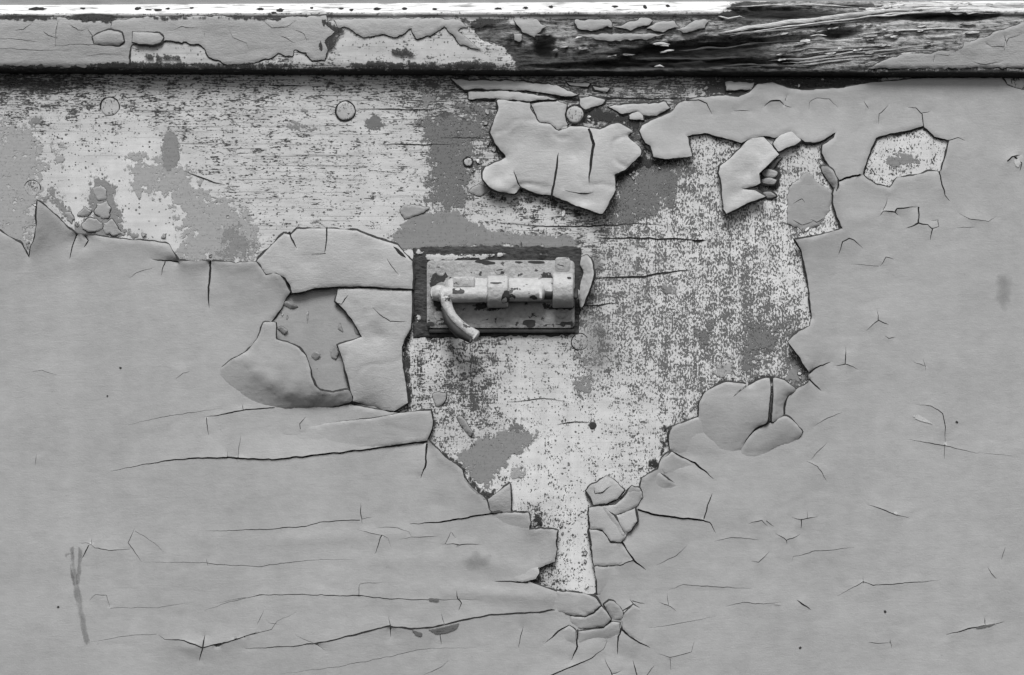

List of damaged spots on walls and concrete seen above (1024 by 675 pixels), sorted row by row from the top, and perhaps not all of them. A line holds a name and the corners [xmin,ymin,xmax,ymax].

peeling [92,28,165,47]
peeling [777,23,839,61]
peeling [825,23,901,64]
peeling [1004,78,1024,89]
peeling [864,128,948,186]
crack [498,222,710,242]
crack [595,269,693,279]
peeling [0,74,902,645]
crack [113,405,428,476]
crack [227,508,526,553]
crack [638,454,843,562]
crack [100,583,768,675]